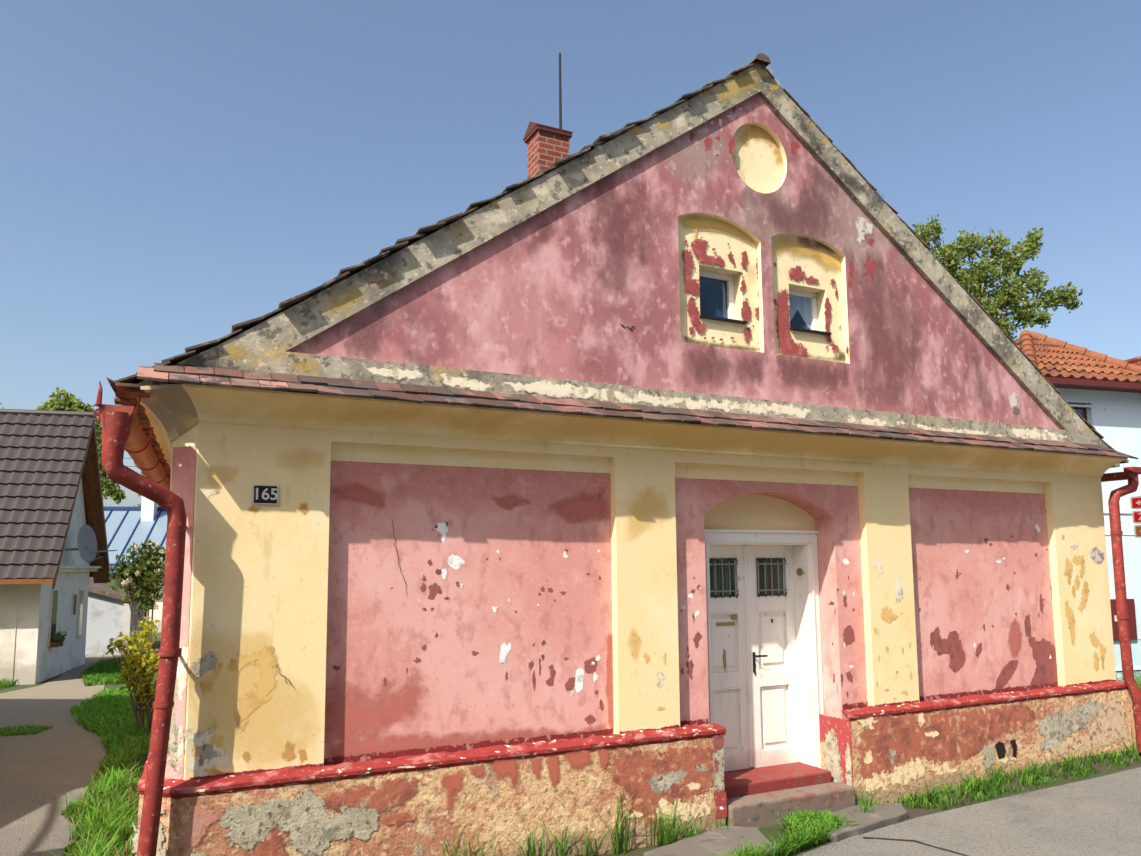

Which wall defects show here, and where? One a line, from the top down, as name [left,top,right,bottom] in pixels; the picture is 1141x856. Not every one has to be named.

peeling [681,236,760,342]
peeling [773,215,877,356]
peeling [365,367,809,418]
peeling [166,644,278,777]
peeling [419,554,465,611]
peeling [528,639,604,724]
peeling [930,624,994,673]
peeling [819,660,1129,794]
peeling [1015,586,1058,685]
peeling [1062,535,1105,646]
flaking render [131,811,142,856]
flaking render [156,775,418,856]